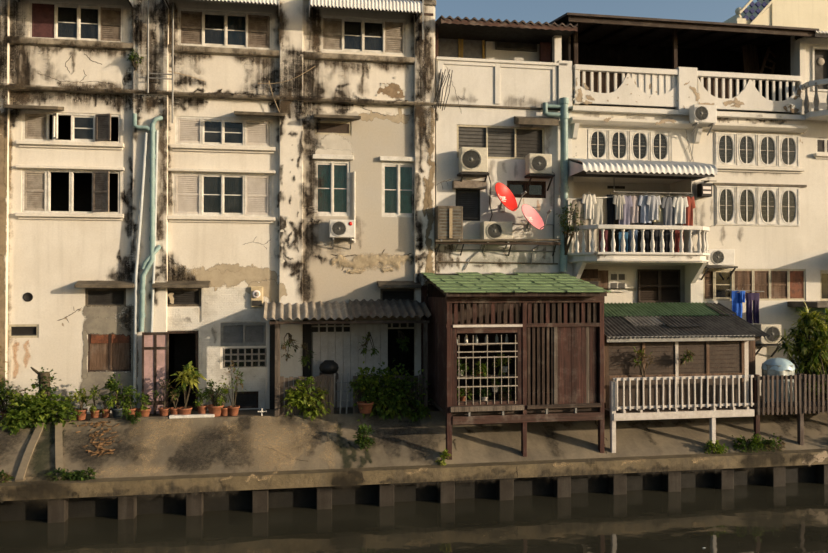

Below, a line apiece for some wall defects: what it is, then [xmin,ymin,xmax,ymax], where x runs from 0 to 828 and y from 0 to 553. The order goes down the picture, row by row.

peeling [359,76,410,124]
peeling [684,81,745,108]
damp [57,0,408,304]
damp [387,15,459,294]
peeling [169,216,302,303]